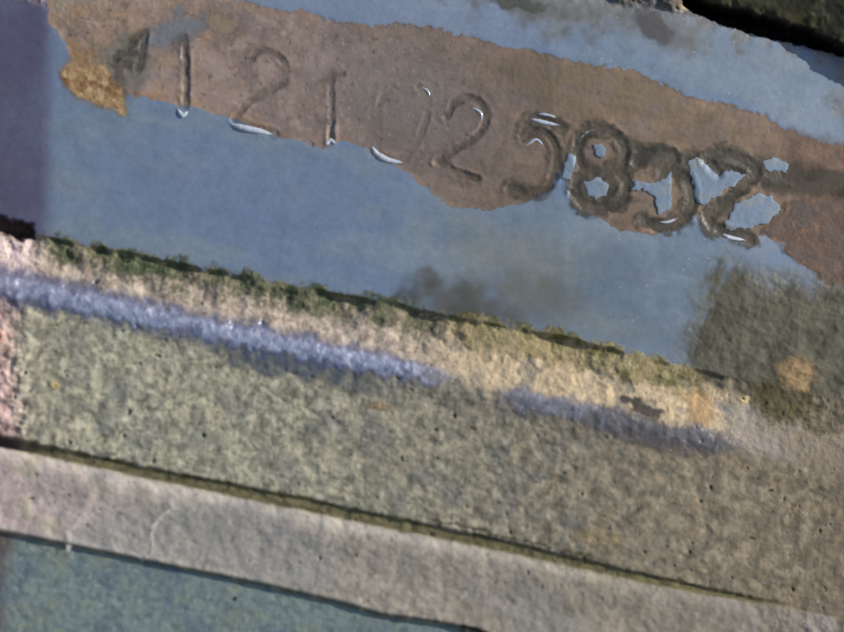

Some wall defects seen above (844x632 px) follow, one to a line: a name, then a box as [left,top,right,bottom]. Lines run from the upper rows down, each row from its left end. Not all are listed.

peeling [46,0,844,250]